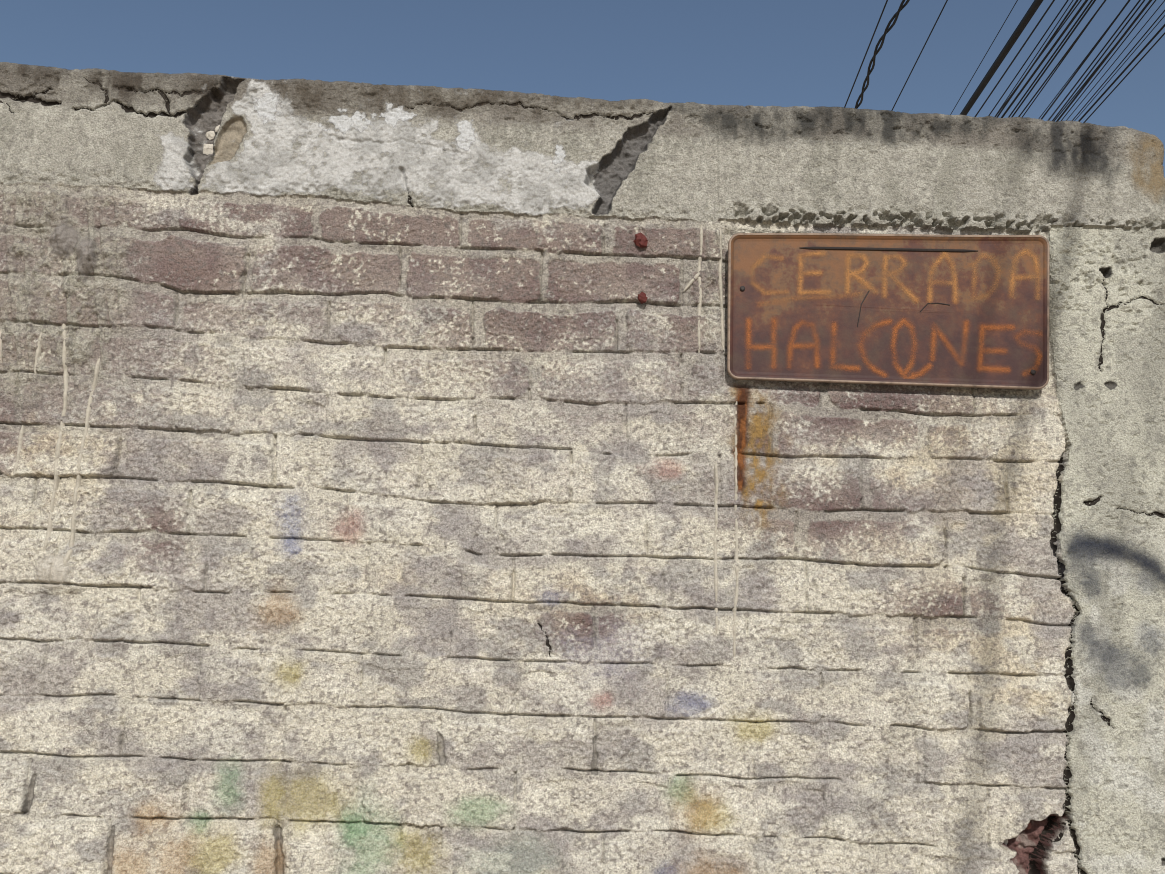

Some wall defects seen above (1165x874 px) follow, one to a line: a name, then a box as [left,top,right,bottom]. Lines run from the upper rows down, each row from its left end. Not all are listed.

crack [0,78,205,118]
crack [1098,279,1162,371]
rust [734,386,772,516]